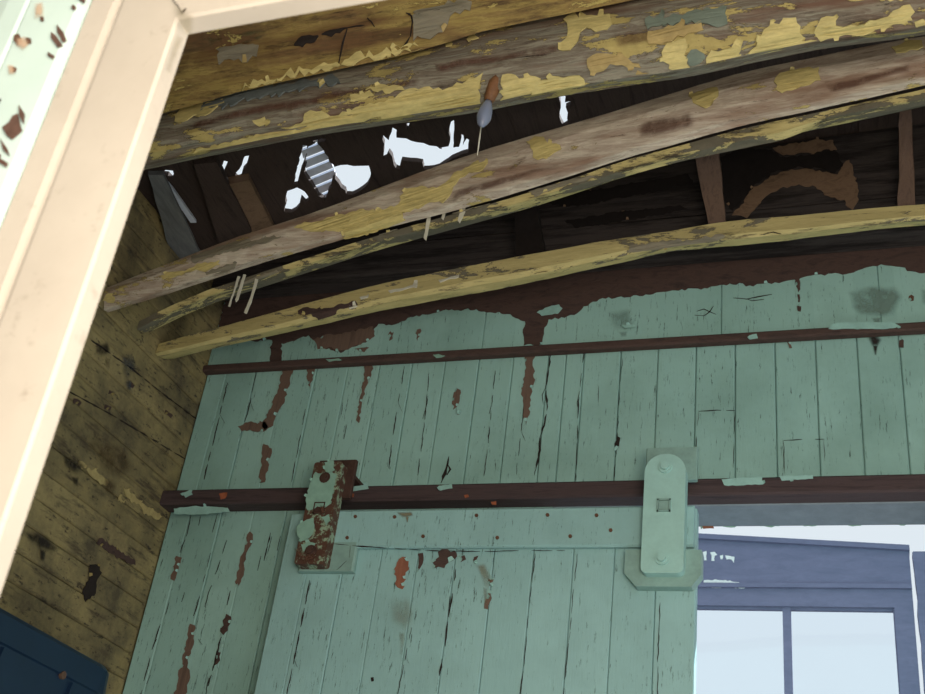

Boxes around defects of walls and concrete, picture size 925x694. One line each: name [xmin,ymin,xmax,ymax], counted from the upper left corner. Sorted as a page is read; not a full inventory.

peeling [0,106,25,167]
peeling [47,25,67,59]
peeling [173,0,472,123]
peeling [193,73,483,154]
peeling [499,52,648,101]
peeling [558,9,612,51]
peeling [645,0,925,70]
peeling [774,67,821,93]
peeling [294,158,488,240]
peeling [161,235,925,432]
peeling [394,549,478,589]
peeling [173,624,196,694]